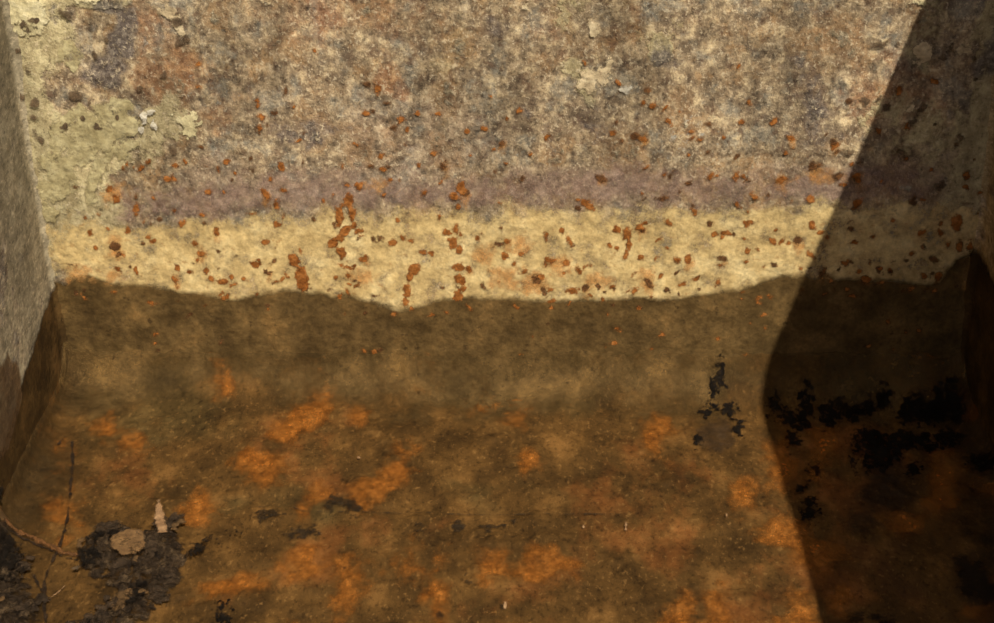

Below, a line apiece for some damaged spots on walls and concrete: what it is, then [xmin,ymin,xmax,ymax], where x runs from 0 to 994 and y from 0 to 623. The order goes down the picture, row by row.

peeling [8,0,115,38]
peeling [54,39,97,73]
peeling [157,1,190,47]
peeling [20,89,157,223]
peeling [170,110,203,140]
corrosion [250,239,312,292]
corrosion [322,182,434,316]
corrosion [438,181,472,311]
corrosion [494,227,701,315]
leakage [0,198,994,603]
corrosion [65,494,243,623]
leakage [215,595,235,623]